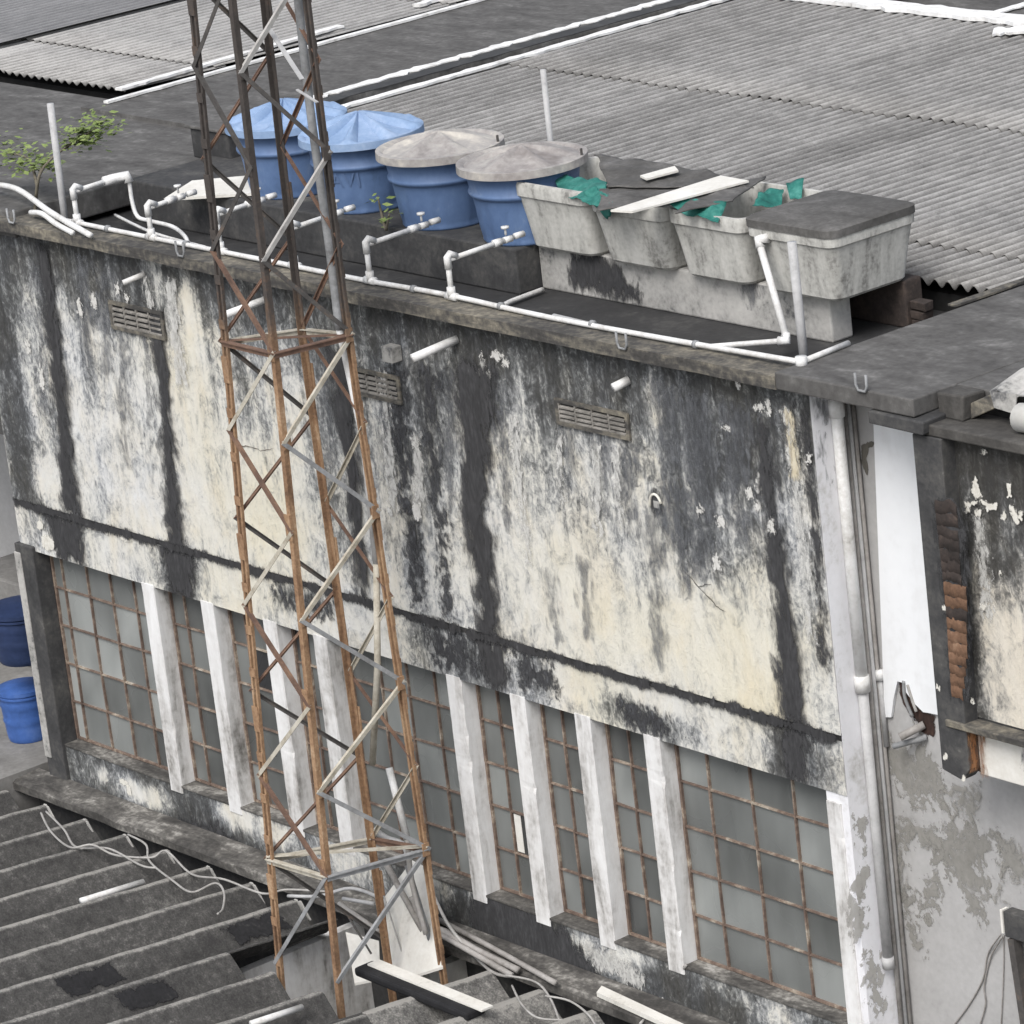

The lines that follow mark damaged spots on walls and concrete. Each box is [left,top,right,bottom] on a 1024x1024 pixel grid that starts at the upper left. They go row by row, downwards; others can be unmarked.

damp [13,242,838,784]
spalling [932,476,1023,705]
damp [178,815,240,842]
peeling [887,681,1024,961]